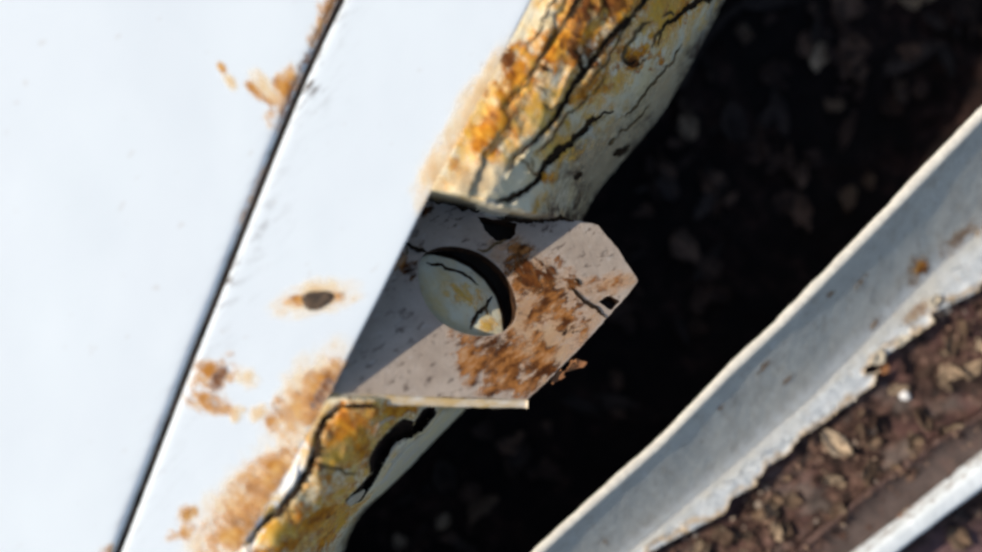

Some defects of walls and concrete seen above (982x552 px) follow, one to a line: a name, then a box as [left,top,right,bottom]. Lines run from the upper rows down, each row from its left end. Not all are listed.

corrosion [217,0,337,131]
corrosion [423,0,720,186]
crack [435,0,712,253]
corrosion [187,360,252,421]
corrosion [207,358,418,552]
crack [249,403,377,544]
corrosion [391,249,417,281]
crack [405,242,493,329]
corrosion [443,238,628,398]
crack [571,278,607,319]
peeling [871,348,889,375]
peeling [897,335,912,347]